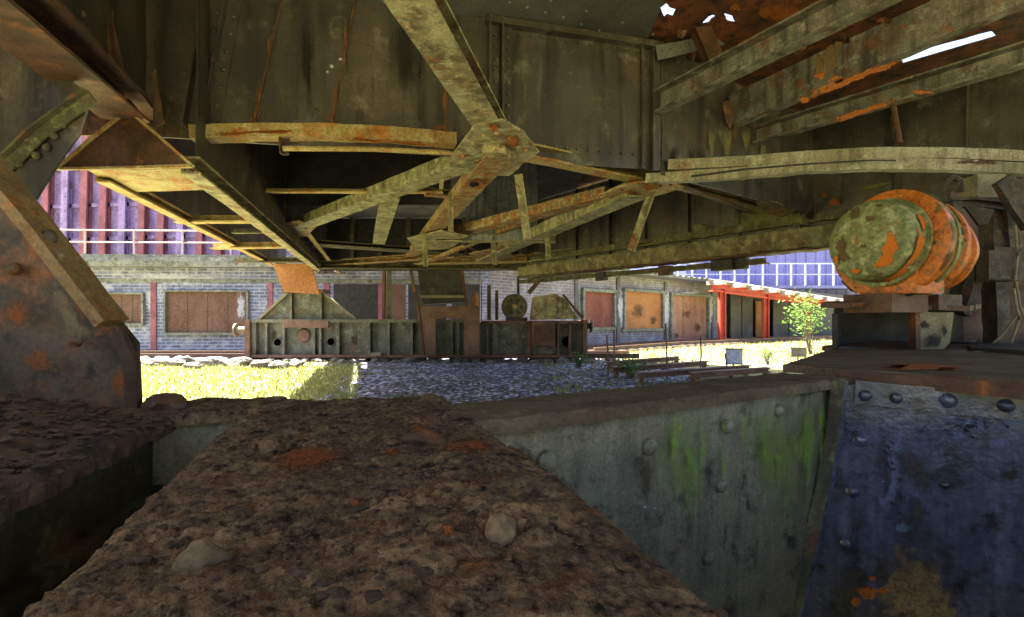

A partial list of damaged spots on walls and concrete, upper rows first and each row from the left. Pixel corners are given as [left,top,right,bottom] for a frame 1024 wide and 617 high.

rust [216,89,292,136]